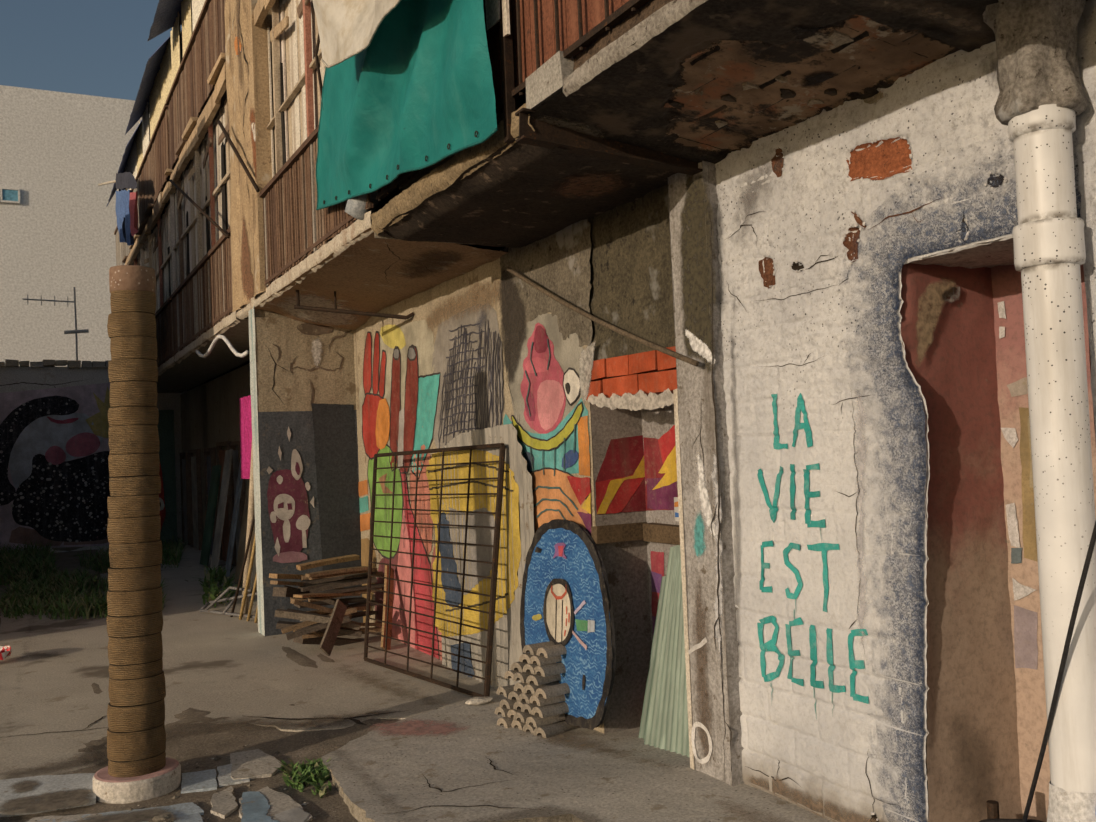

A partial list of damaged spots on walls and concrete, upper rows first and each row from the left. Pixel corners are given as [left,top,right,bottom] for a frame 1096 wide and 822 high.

spalling [664,15,956,151]
water stain [802,72,838,87]
spalling [769,148,785,177]
spalling [846,136,913,181]
spalling [842,210,866,265]
spalling [758,255,776,289]
crack [270,353,288,403]
crack [694,170,849,787]
crack [833,388,870,652]
crack [386,758,540,815]
crack [865,749,895,813]